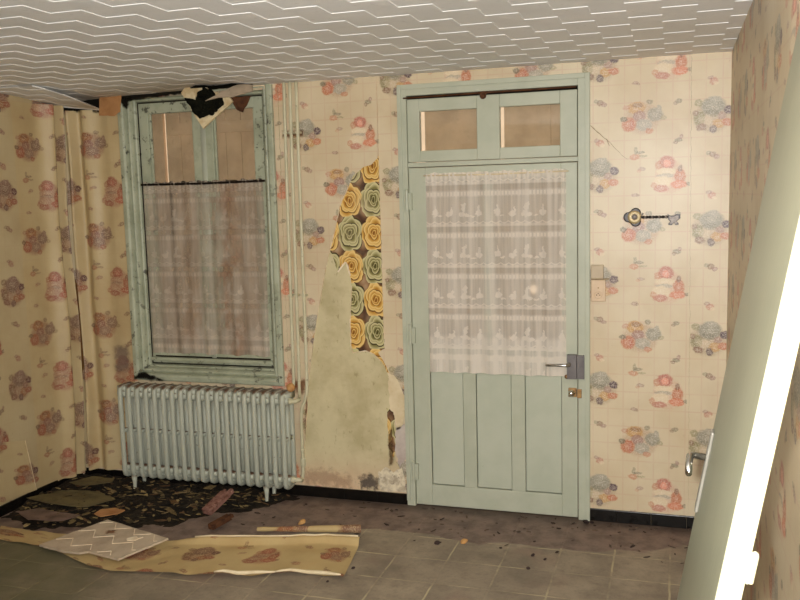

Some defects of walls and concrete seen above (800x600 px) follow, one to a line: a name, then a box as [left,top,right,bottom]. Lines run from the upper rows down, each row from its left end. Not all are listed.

flaking render [302,251,406,493]